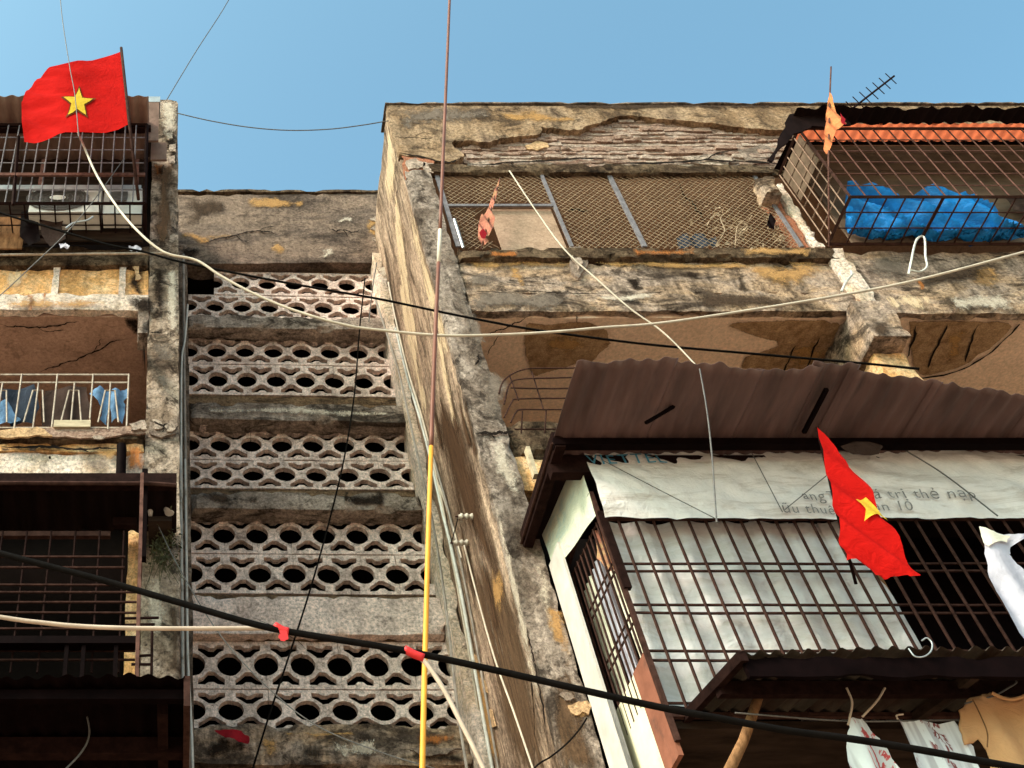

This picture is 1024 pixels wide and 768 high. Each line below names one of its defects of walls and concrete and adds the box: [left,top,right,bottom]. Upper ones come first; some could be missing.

spalling [385,119,794,417]
crack [1,321,78,332]
crack [41,339,117,372]